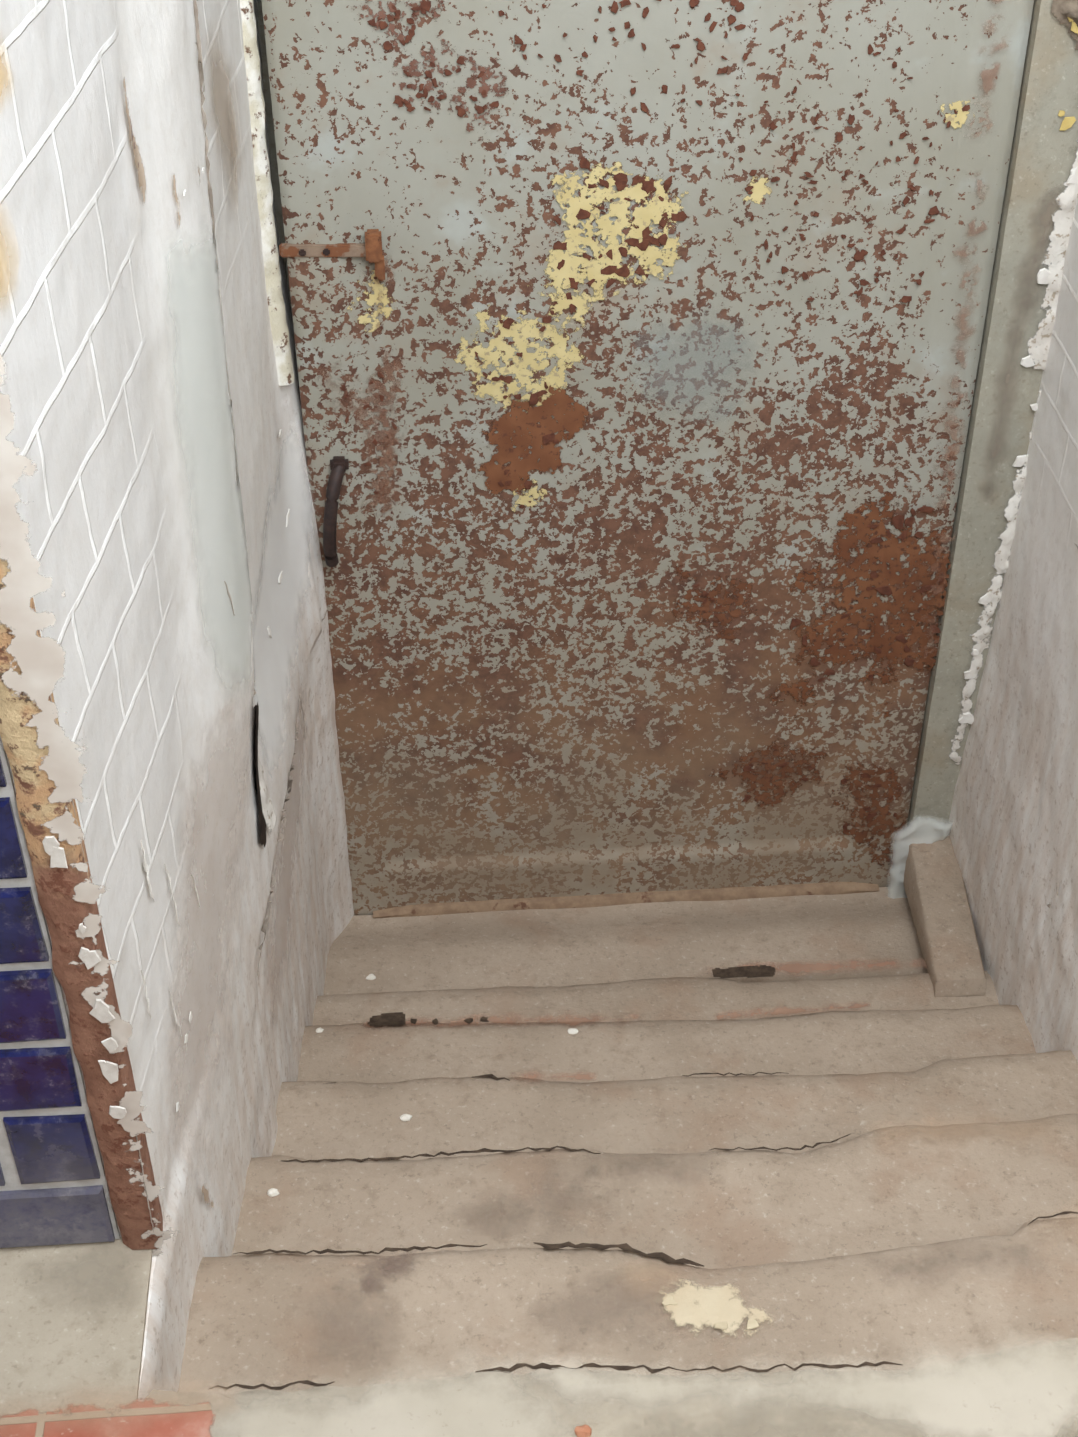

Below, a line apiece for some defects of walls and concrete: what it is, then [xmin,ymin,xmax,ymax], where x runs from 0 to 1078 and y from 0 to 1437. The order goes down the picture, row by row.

corrosion [351,0,526,146]
corrosion [671,0,746,64]
peeling [454,156,689,412]
peeling [1020,151,1078,371]
corrosion [476,385,590,495]
corrosion [766,271,976,720]
peeling [949,390,1041,765]
peeling [89,999,118,1084]
crack [282,1146,601,1163]
crack [234,1244,487,1255]
crack [533,1241,704,1267]
crack [475,1361,902,1374]